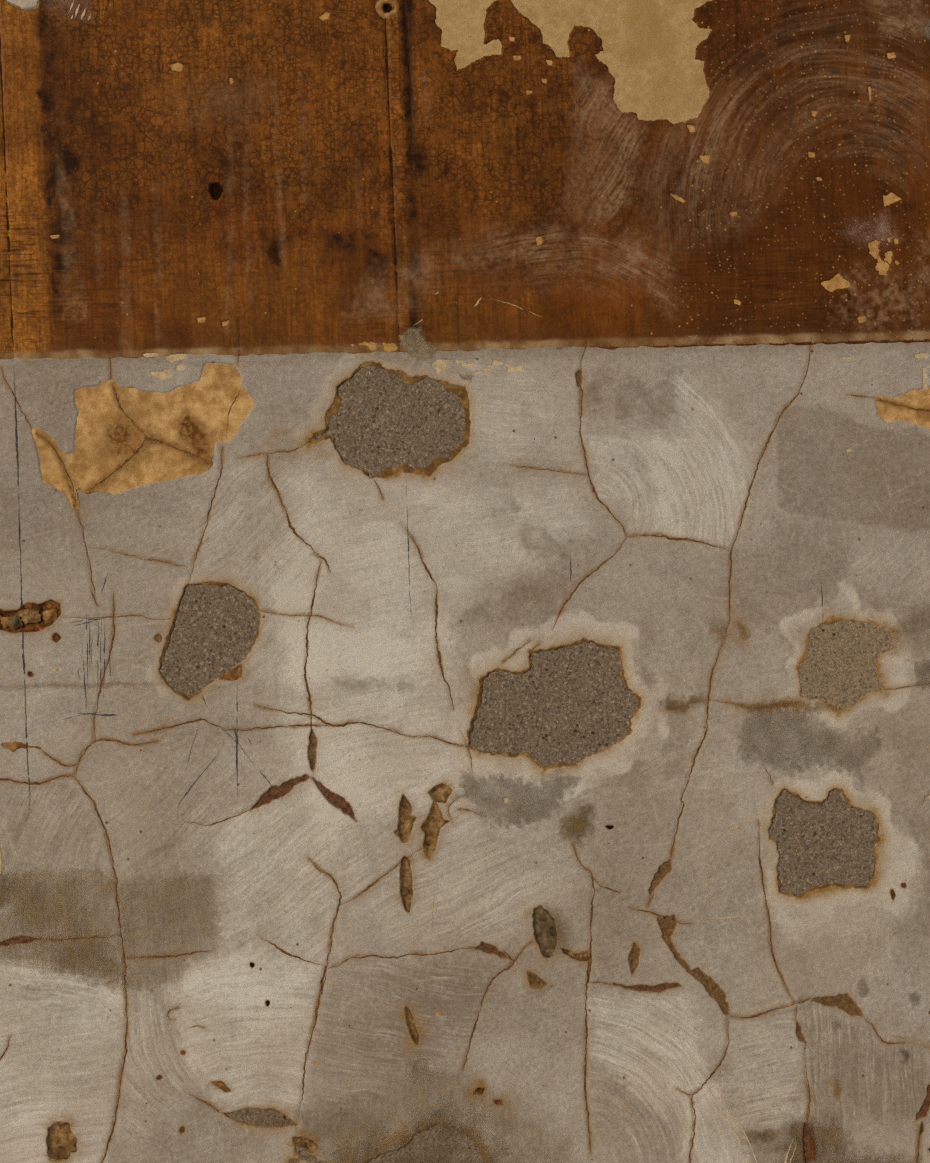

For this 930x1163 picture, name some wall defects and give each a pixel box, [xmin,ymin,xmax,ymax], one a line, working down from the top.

peeling [429,0,521,71]
peeling [511,0,712,132]
peeling [32,353,255,510]
flaking render [310,362,471,478]
spalling [0,600,61,633]
flaking render [160,582,261,700]
crack [0,442,472,1163]
flaking render [468,638,641,771]
crack [503,336,905,1163]
flaking render [769,789,880,898]
crack [259,846,532,1126]
crack [916,1085,930,1162]